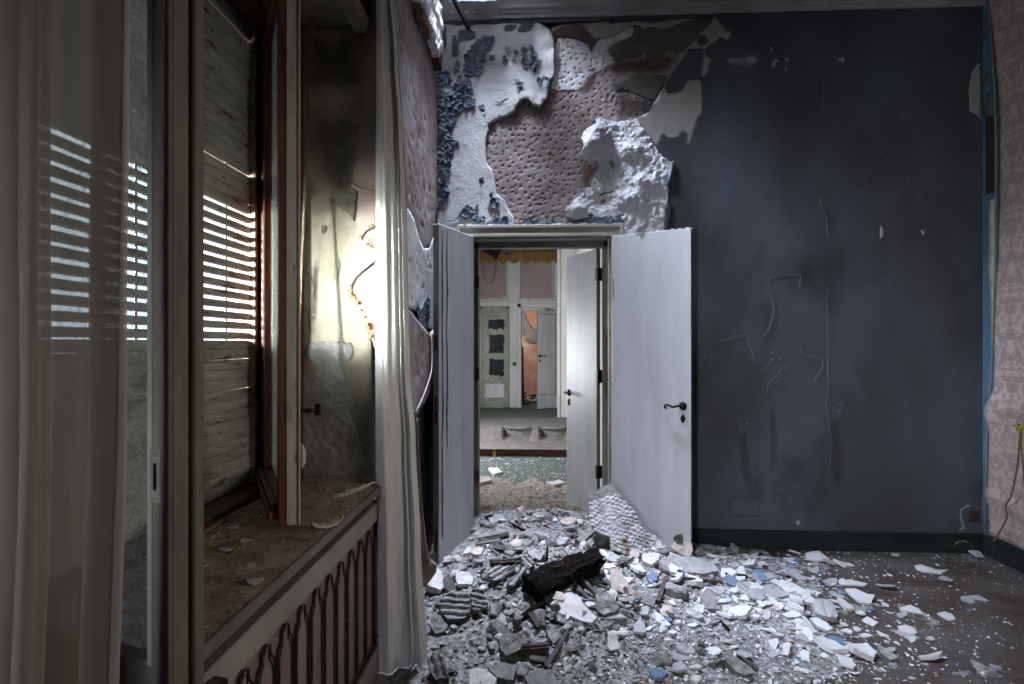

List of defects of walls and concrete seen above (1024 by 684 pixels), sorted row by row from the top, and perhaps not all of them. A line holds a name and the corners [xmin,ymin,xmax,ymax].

peeling [969,63,981,119]
spalling [394,0,731,554]
crack [704,274,831,485]